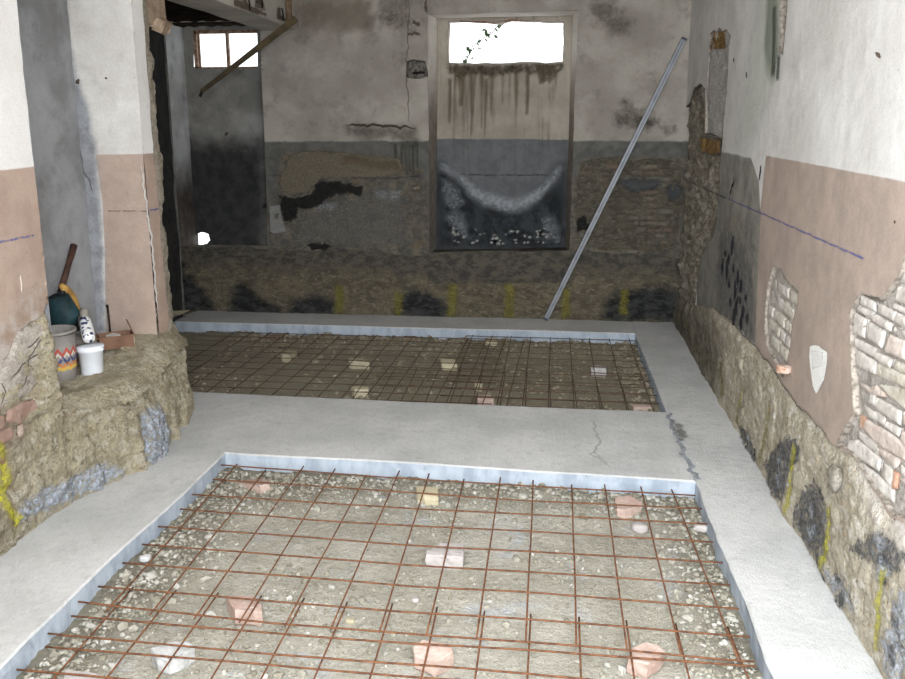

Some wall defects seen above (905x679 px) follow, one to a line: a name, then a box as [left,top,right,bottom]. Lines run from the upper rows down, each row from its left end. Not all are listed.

damp [449,64,563,110]
flaking render [279,150,403,196]
flaking render [764,265,798,379]
flaking render [0,305,46,464]
crack [589,419,611,469]
flaking render [836,259,905,519]